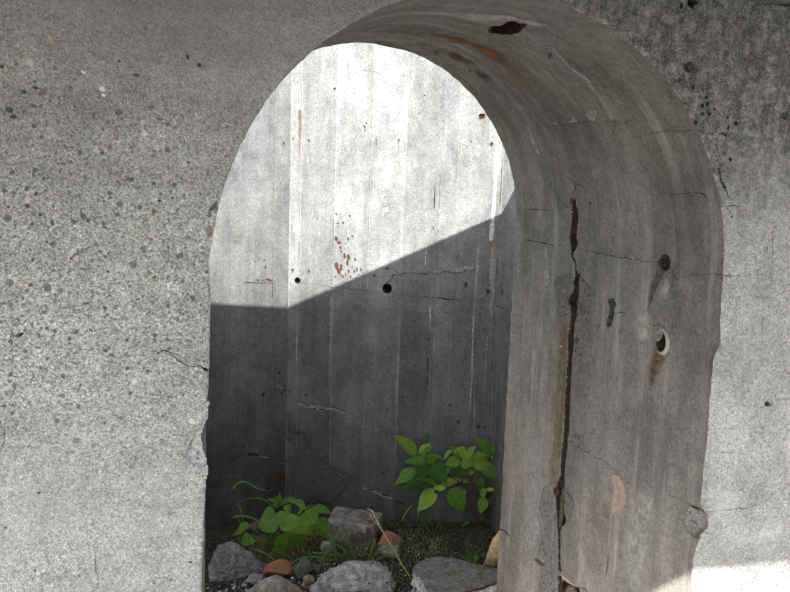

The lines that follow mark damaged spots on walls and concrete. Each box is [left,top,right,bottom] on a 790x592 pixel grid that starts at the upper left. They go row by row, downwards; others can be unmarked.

spalling [481,18,541,38]
rust [426,34,528,90]
crack [386,266,479,283]
crack [138,350,208,371]
crack [529,151,615,583]
spalling [532,483,587,592]